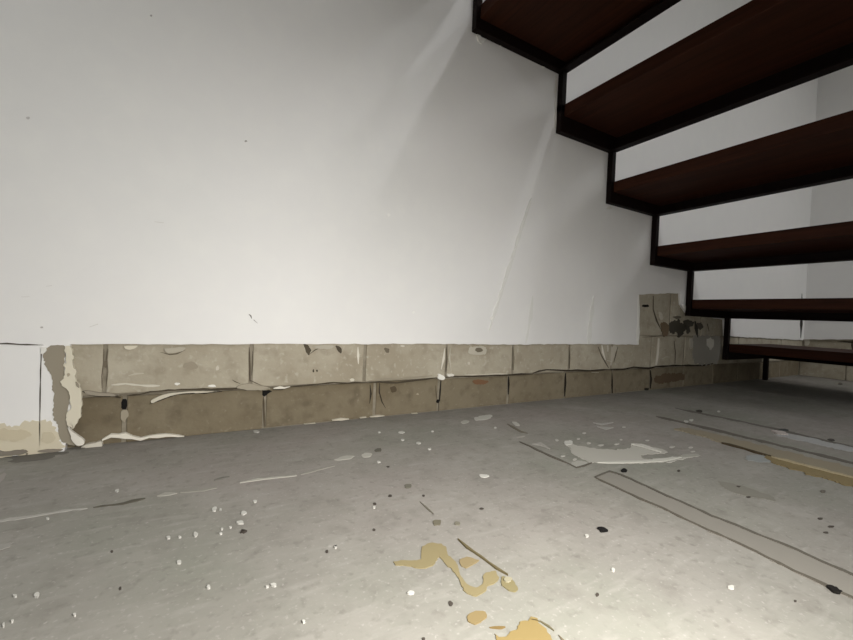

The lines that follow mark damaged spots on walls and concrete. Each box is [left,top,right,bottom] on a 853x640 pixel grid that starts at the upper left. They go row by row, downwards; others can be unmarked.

spalling [0,345,85,458]